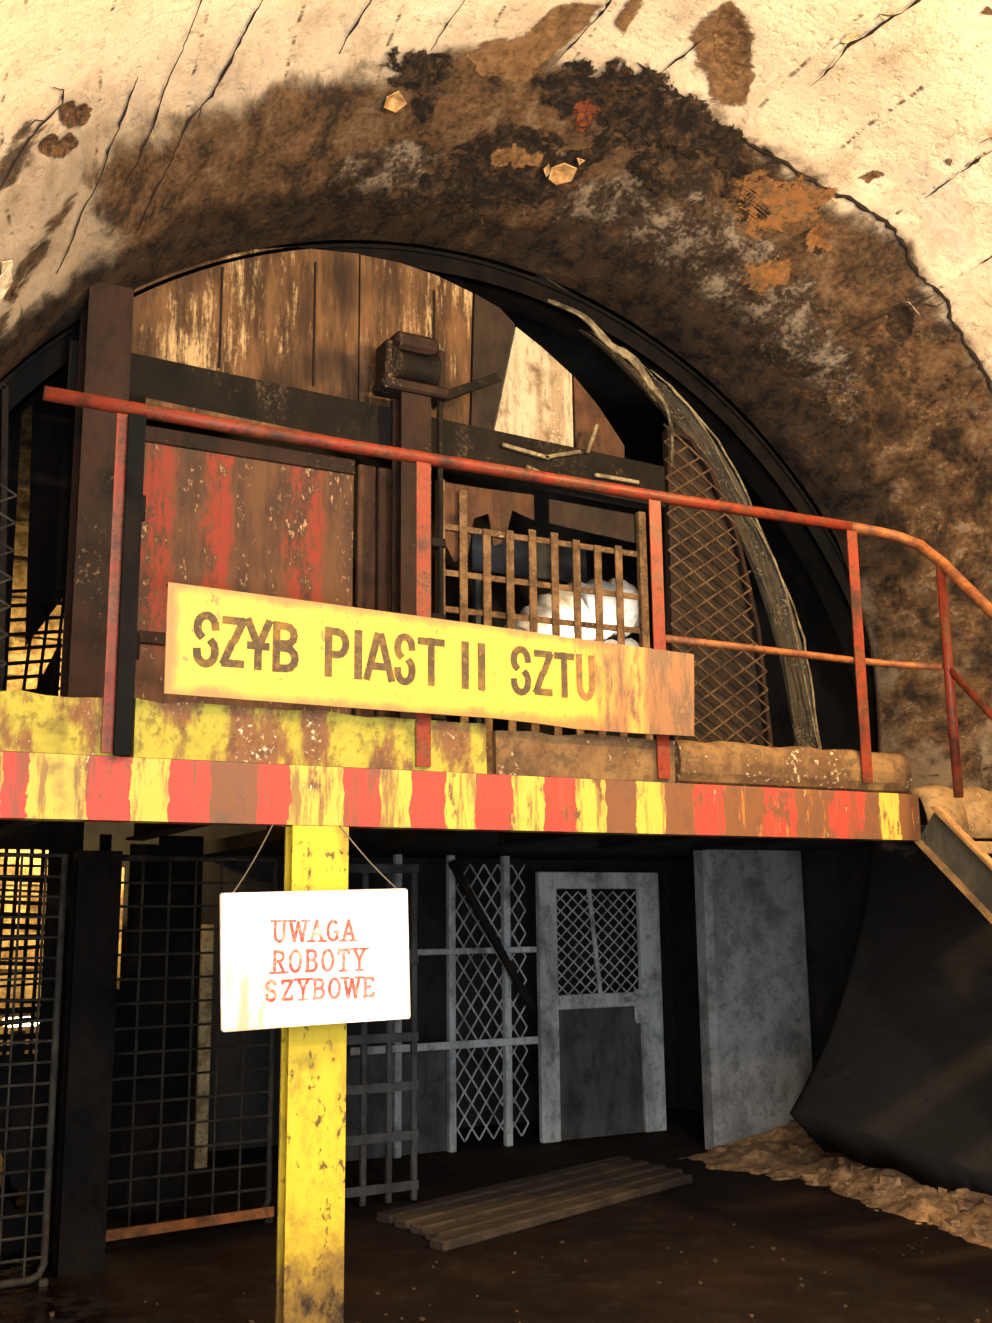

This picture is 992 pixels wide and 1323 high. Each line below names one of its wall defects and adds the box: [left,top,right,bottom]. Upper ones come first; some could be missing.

spalling [712,11,751,82]
crack [0,87,64,189]
spalling [39,100,93,159]
crack [637,37,992,400]
water stain [83,0,992,791]